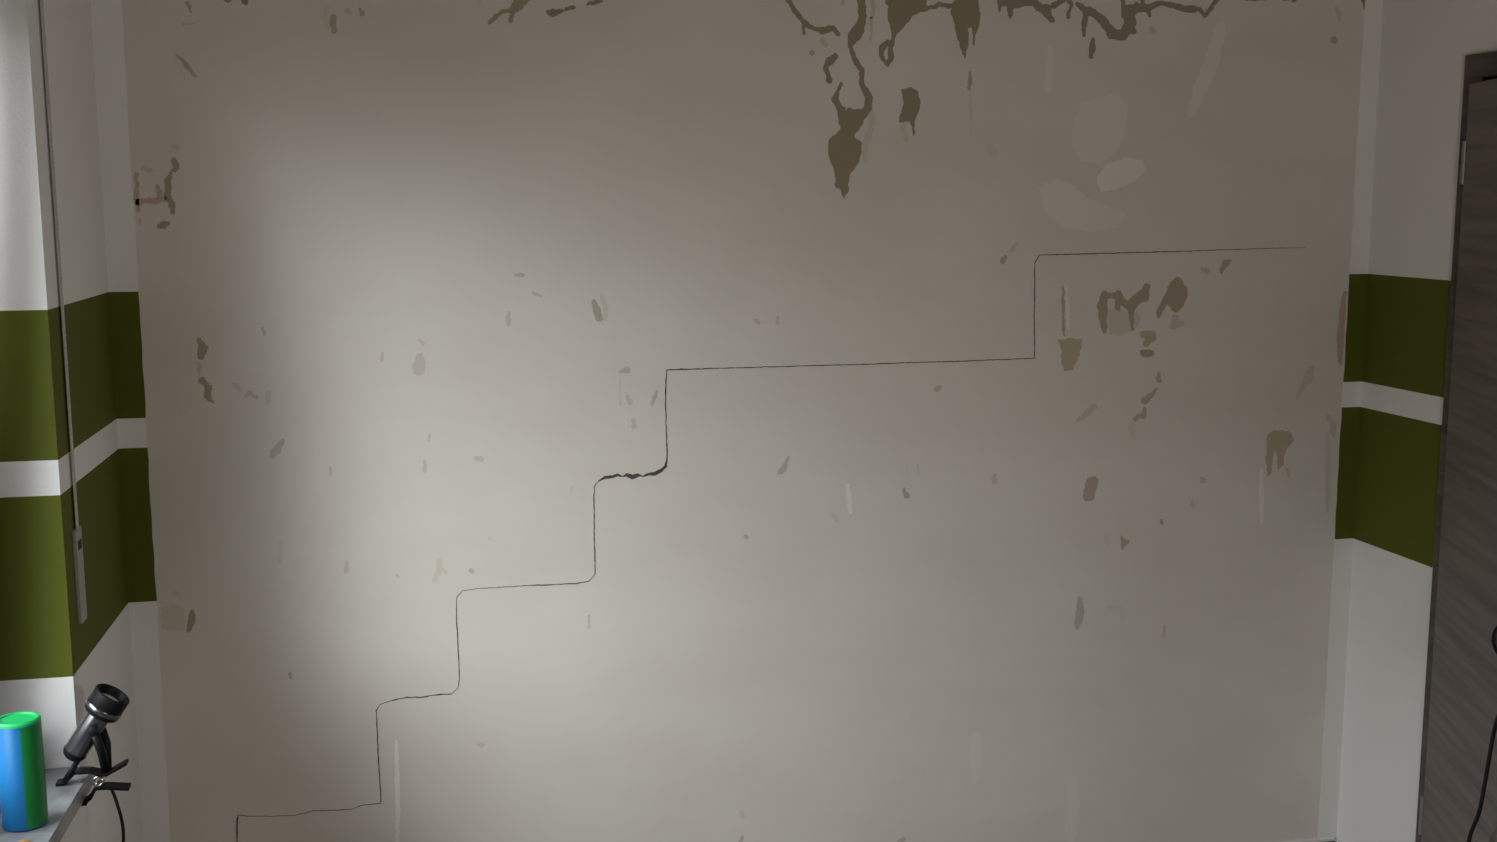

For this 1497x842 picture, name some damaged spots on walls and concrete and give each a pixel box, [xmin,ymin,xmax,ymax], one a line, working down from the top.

flaking render [487,0,530,25]
flaking render [546,0,603,17]
flaking render [879,0,1219,67]
flaking render [785,0,873,199]
flaking render [899,87,921,136]
crack [236,247,1306,841]